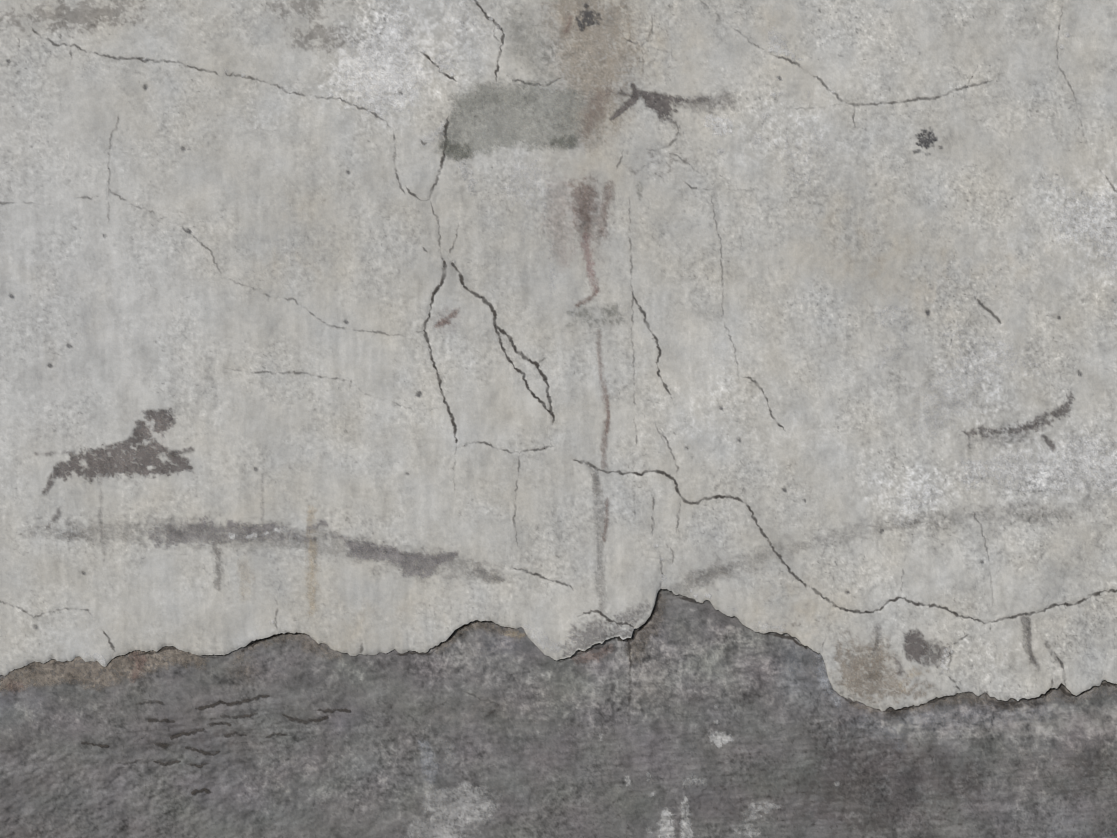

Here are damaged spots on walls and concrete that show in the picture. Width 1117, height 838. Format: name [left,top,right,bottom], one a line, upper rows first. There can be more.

crack [397,119,448,196]
leakage [440,139,469,160]
crack [423,260,554,445]
crack [634,297,669,392]
spalling [43,410,193,493]
spalling [964,396,1074,448]
crack [576,460,1117,622]
spalling [0,646,206,690]
crack [398,621,484,655]
crack [560,575,695,667]
spalling [905,630,948,669]
peeling [680,776,697,838]